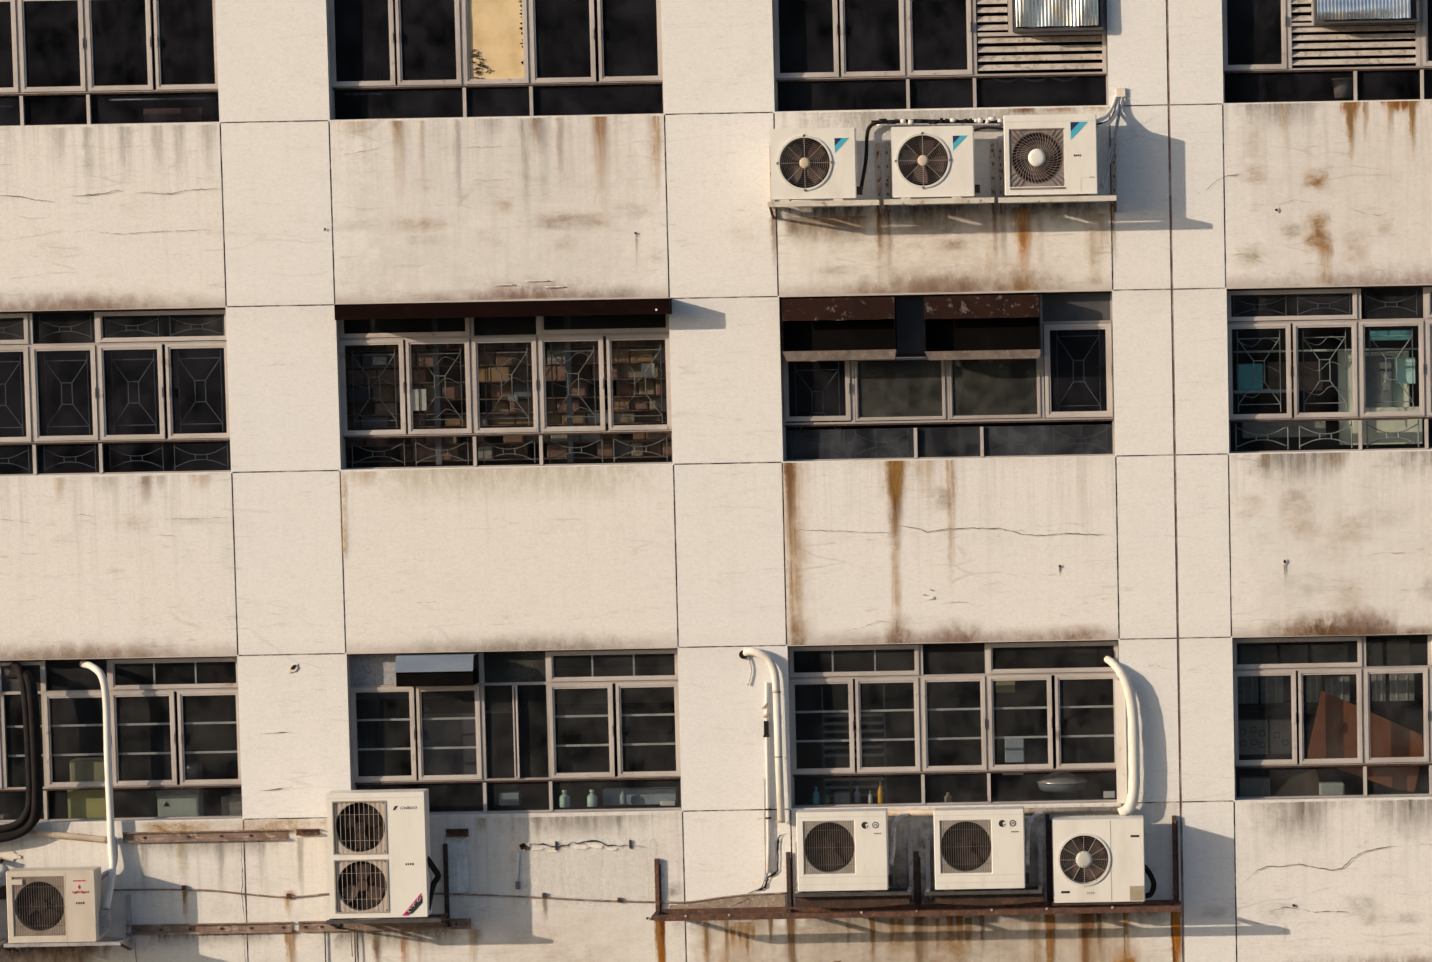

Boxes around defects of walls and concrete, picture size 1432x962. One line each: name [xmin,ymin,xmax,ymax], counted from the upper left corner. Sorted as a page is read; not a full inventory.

rust [1343,101,1417,143]
rust [993,207,1030,252]
leakage [1258,452,1339,470]
rust [889,461,903,522]
rust [785,463,796,595]
crack [800,525,1103,536]
leakage [1285,616,1423,636]
crack [1247,840,1430,880]
rust [655,921,665,962]
rust [703,912,796,962]
rust [869,915,984,962]
rust [1033,907,1055,962]